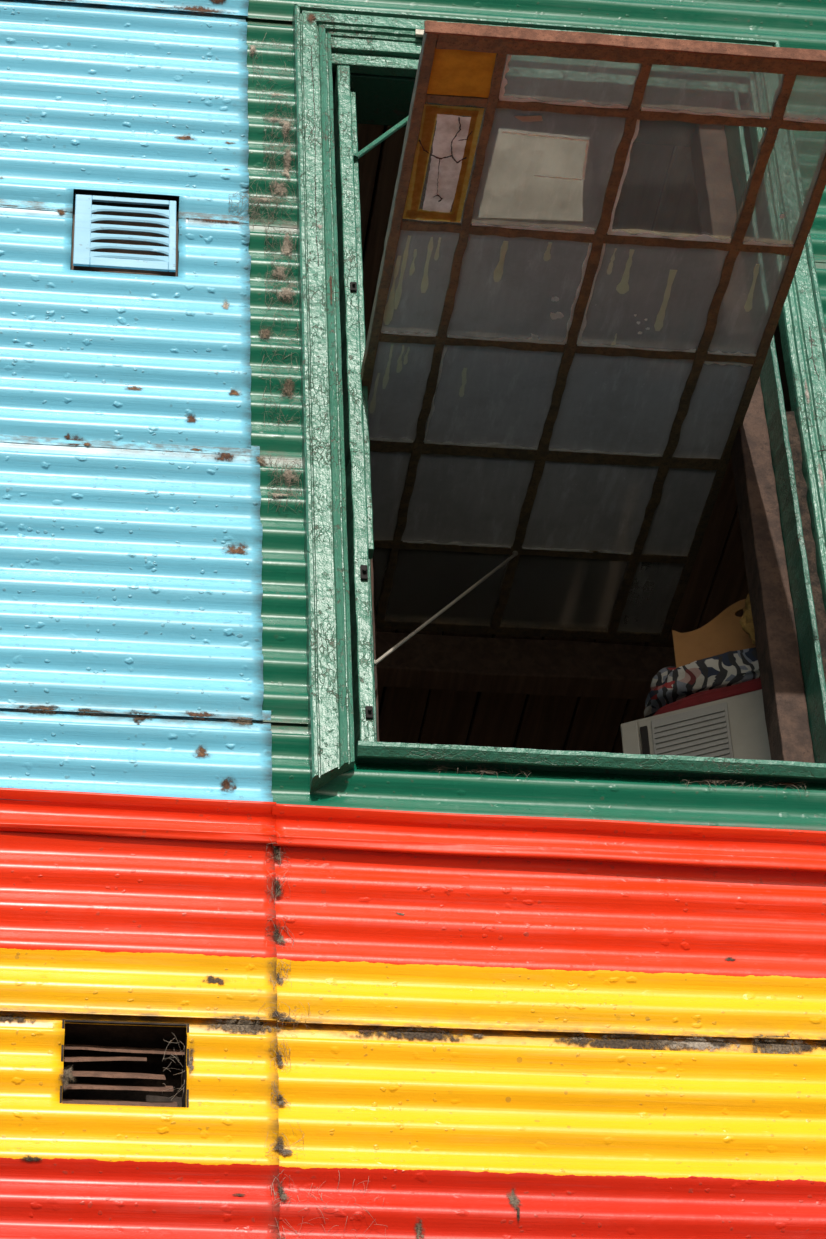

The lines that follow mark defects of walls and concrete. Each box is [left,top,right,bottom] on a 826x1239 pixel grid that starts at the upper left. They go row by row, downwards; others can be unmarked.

rust [223,544,247,554]
rust [186,711,214,721]